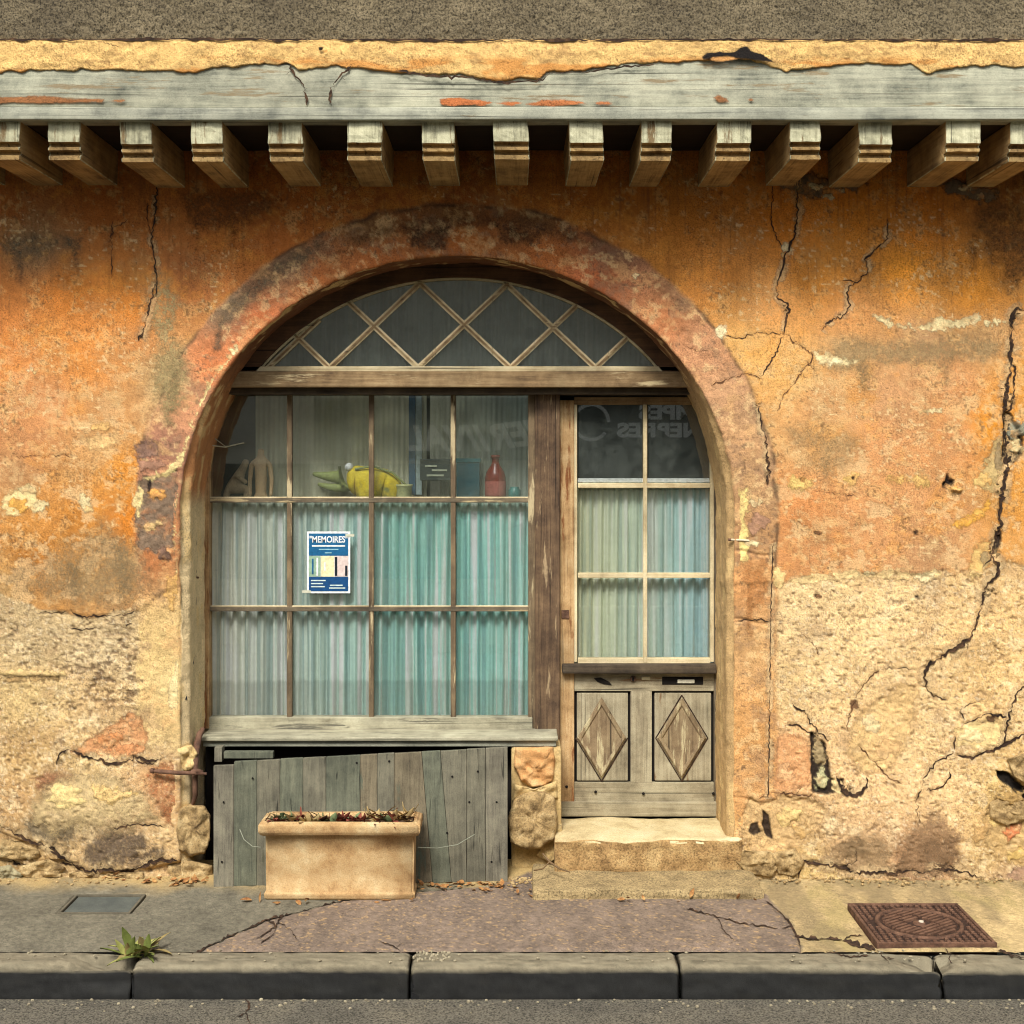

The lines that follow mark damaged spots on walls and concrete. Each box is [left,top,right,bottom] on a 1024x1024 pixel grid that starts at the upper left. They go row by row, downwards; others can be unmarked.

crack [0,37,1024,105]
peeling [440,98,610,107]
spalling [702,46,773,62]
crack [711,180,893,485]
crack [739,302,1024,826]
crack [56,749,161,765]
spalling [846,682,919,773]
spalling [954,716,1005,752]
crack [0,817,177,874]
spalling [738,733,844,852]
leakage [819,816,963,878]
spalling [971,771,1024,881]